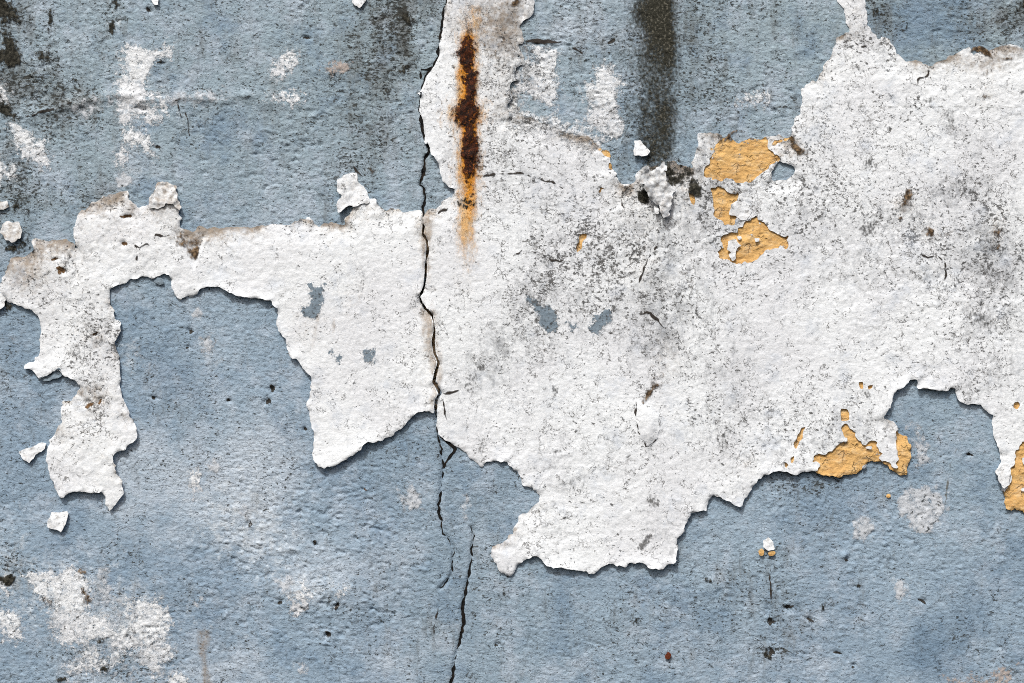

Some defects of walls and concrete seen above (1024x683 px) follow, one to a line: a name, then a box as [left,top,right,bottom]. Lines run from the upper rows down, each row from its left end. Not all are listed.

peeling [0,173,438,511]
crack [418,0,475,683]
corrosion [449,3,488,245]
leakage [632,0,705,199]
peeling [418,0,1024,576]